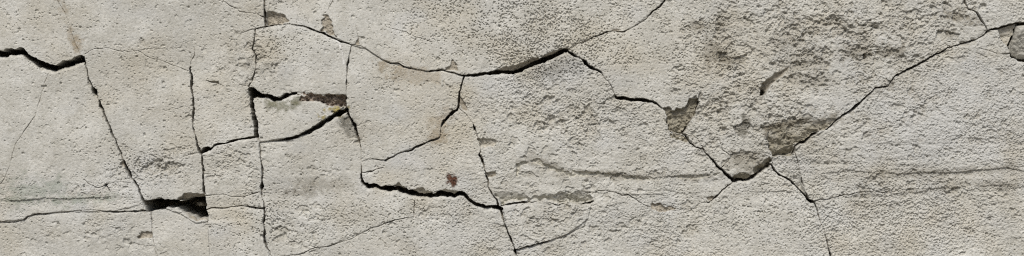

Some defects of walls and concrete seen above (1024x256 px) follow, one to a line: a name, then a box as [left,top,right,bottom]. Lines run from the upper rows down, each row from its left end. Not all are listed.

crack [0,0,666,256]
spalling [662,97,699,142]
spalling [732,117,838,181]
crack [670,0,1024,256]